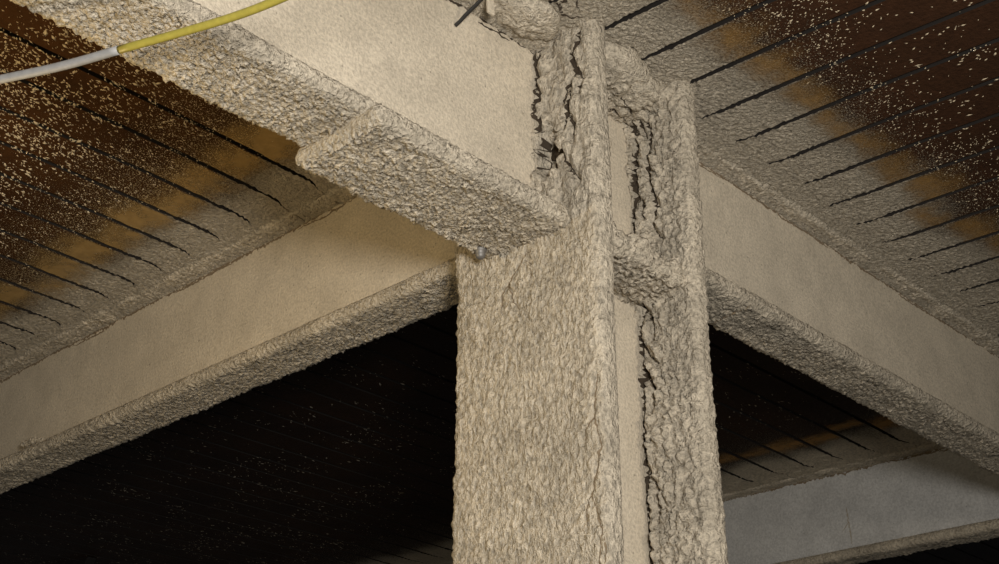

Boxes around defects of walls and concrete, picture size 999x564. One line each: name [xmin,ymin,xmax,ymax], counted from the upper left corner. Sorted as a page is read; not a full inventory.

rust [41,127,298,288]
spalling [549,116,566,183]
crack [585,372,607,564]